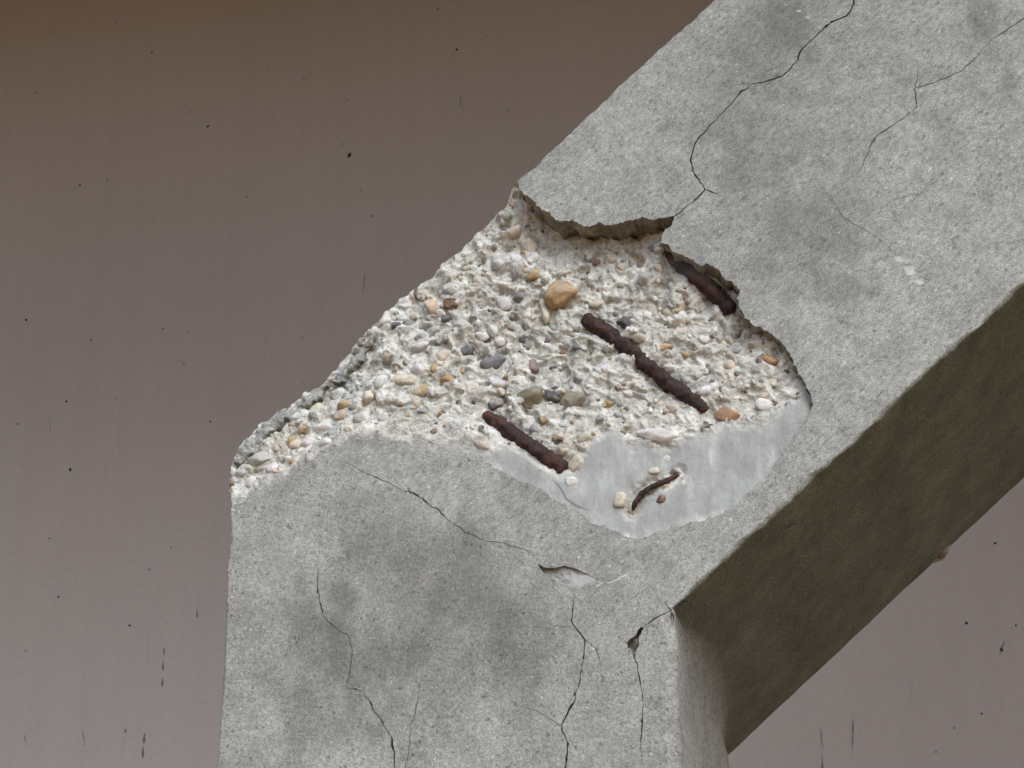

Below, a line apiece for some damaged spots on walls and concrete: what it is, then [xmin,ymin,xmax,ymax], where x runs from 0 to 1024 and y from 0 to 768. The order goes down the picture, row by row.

crack [673,0,855,218]
crack [856,18,1024,176]
spalling [229,184,813,539]
crack [352,465,538,560]
crack [555,482,589,510]
crack [316,567,424,768]
crack [518,570,633,768]
crack [633,655,643,757]
crack [642,599,688,630]